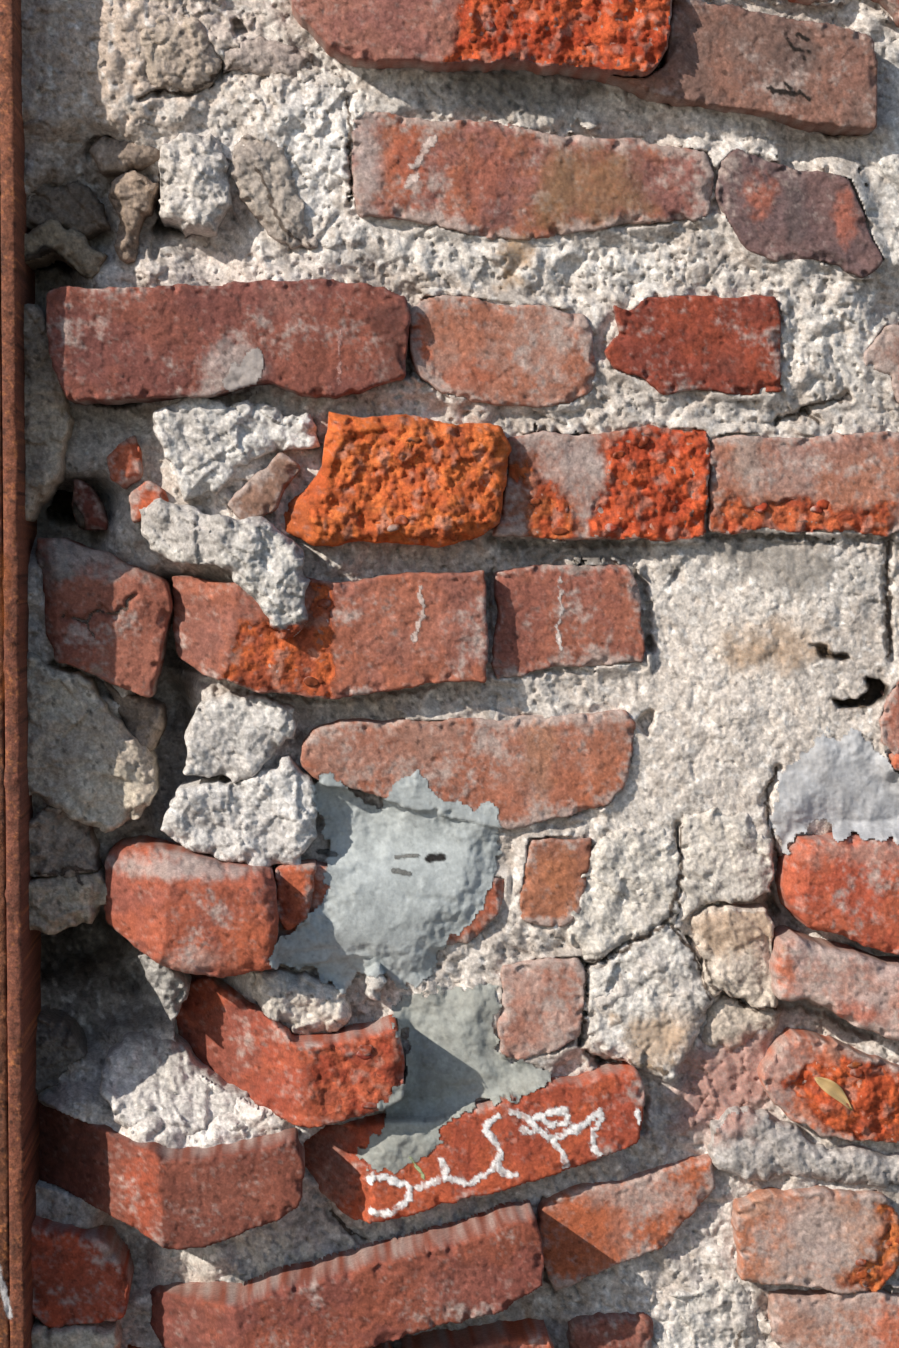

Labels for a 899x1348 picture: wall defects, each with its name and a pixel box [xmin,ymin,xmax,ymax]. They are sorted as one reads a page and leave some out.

spalling [222,582,336,698]
crack [577,826,777,1075]